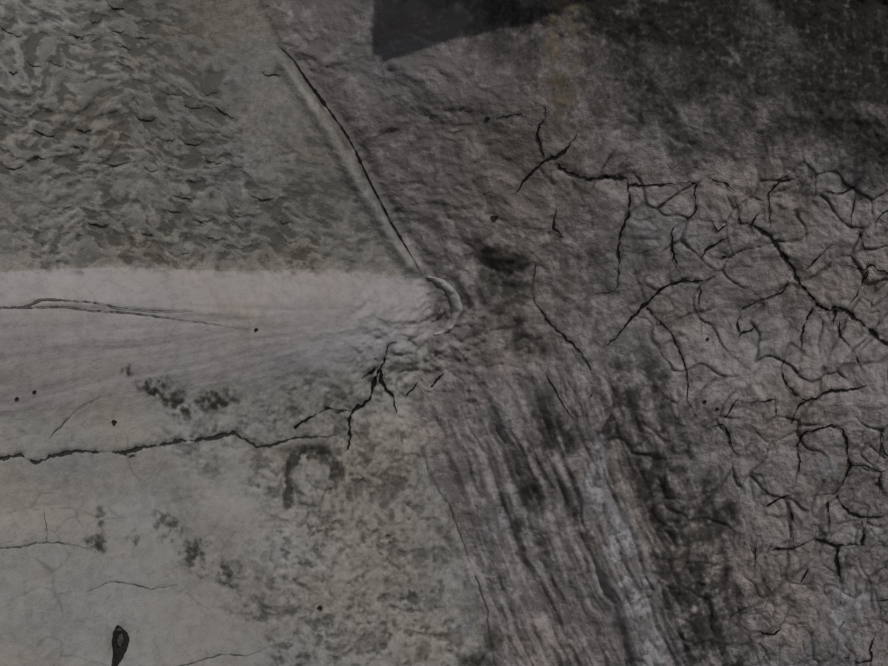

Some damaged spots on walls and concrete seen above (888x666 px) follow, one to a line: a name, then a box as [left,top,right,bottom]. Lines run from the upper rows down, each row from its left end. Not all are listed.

crack [279,46,423,275]
crack [0,298,248,329]
crack [0,341,444,464]
crack [496,99,888,666]
spalling [112,625,129,666]